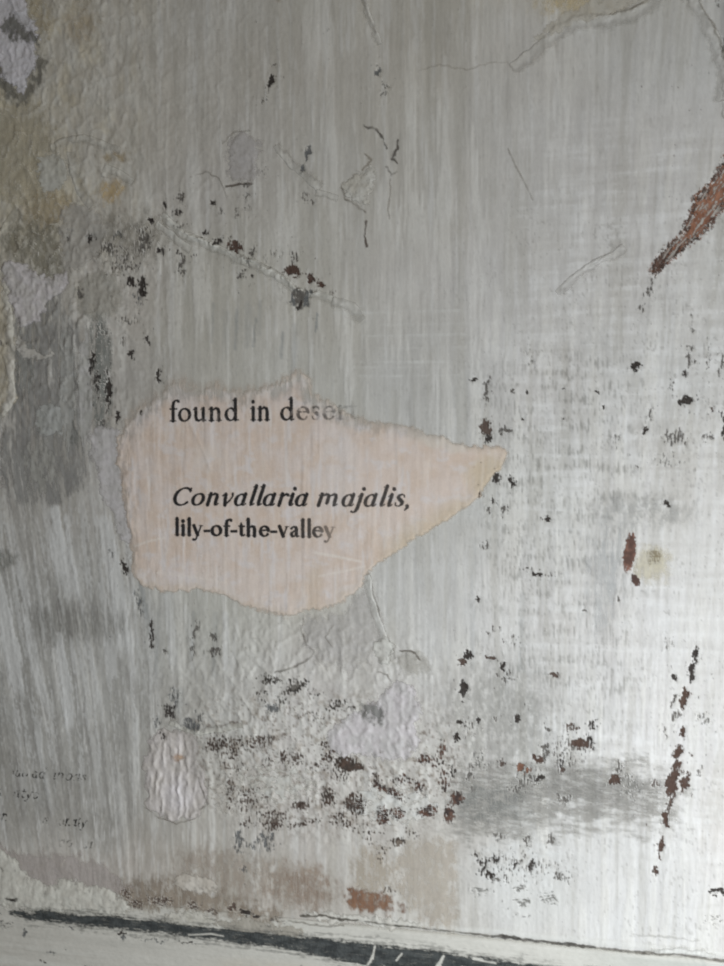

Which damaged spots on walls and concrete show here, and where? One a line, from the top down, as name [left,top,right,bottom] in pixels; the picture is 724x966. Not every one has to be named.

crack [510,0,661,71]
crack [688,0,724,101]
peeling [256,673,319,712]
peeling [458,650,511,683]
peeling [142,680,481,861]
peeling [497,719,598,793]
peeling [609,760,638,794]
corrosion [347,888,392,913]